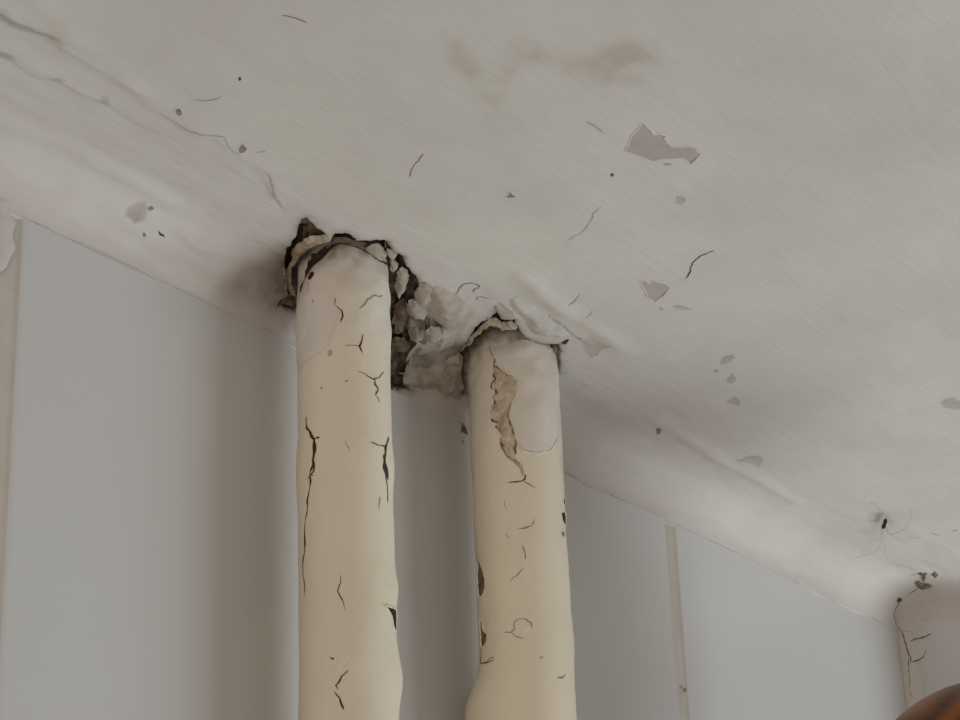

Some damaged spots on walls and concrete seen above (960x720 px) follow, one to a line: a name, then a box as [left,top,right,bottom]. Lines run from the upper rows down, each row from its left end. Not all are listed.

peeling [624,122,703,166]
crack [312,295,383,322]
flaking render [278,223,613,400]
peeling [637,279,692,311]
crack [345,334,384,402]
crack [302,423,320,593]
crack [345,437,389,510]
crack [504,475,536,581]
crack [893,588,930,696]
crack [329,657,349,710]